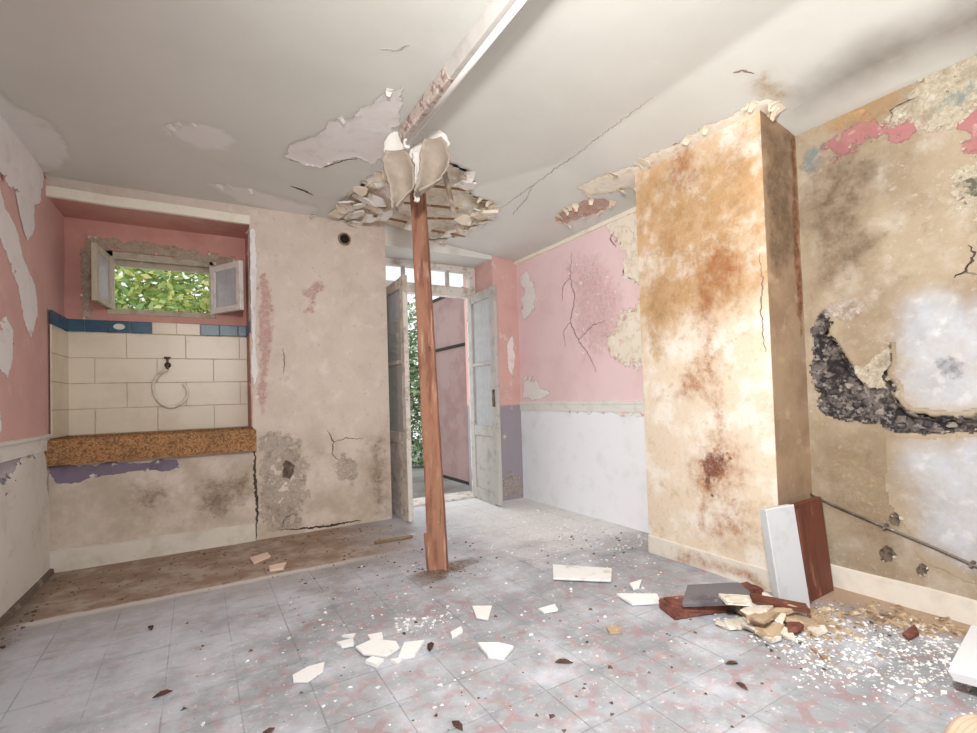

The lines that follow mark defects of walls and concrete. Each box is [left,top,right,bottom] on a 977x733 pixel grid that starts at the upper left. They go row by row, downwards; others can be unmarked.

peeling [0,93,73,338]
peeling [283,87,412,228]
spalling [426,163,501,243]
peeling [554,99,786,228]
water stain [649,162,745,319]
peeling [806,55,977,221]
peeling [0,316,15,378]
peeling [80,228,275,421]
crack [562,255,606,370]
spalling [590,299,642,371]
spalling [809,297,977,435]
peeling [0,451,181,617]